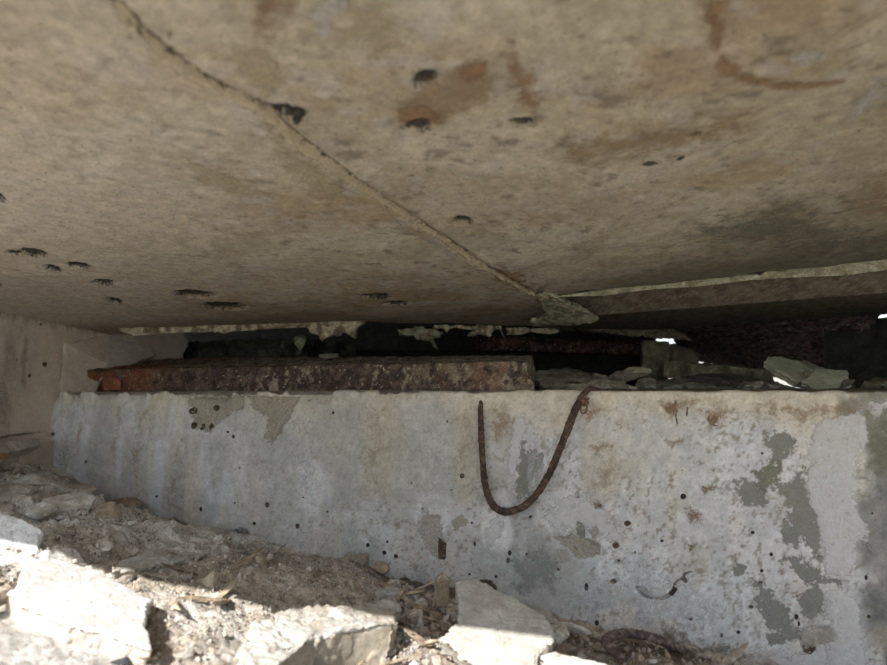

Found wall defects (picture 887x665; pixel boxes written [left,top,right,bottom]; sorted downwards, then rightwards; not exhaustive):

crack [104,0,549,299]
rust [398,59,494,124]
spalling [188,394,298,445]
leakage [592,569,867,665]
peeling [732,429,843,655]
leakage [804,401,887,577]